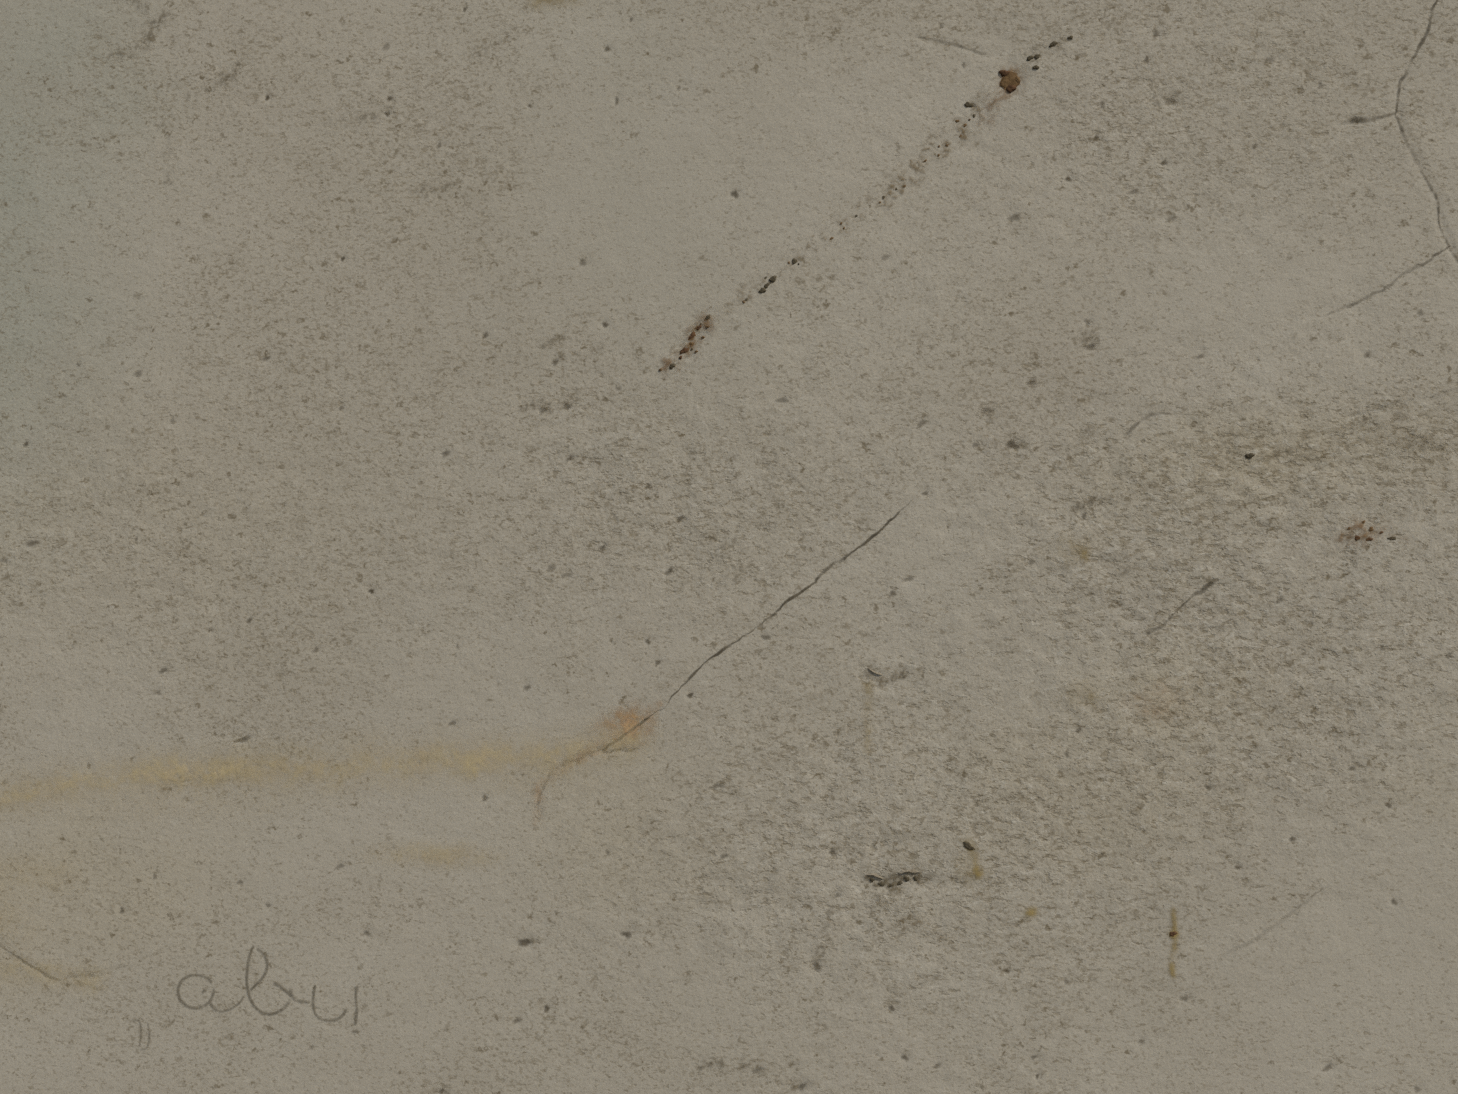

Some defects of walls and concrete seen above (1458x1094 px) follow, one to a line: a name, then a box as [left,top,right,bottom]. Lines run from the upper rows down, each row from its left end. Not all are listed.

corrosion [999,69,1020,93]
crack [1355,0,1438,131]
corrosion [659,314,711,371]
crack [603,514,897,751]